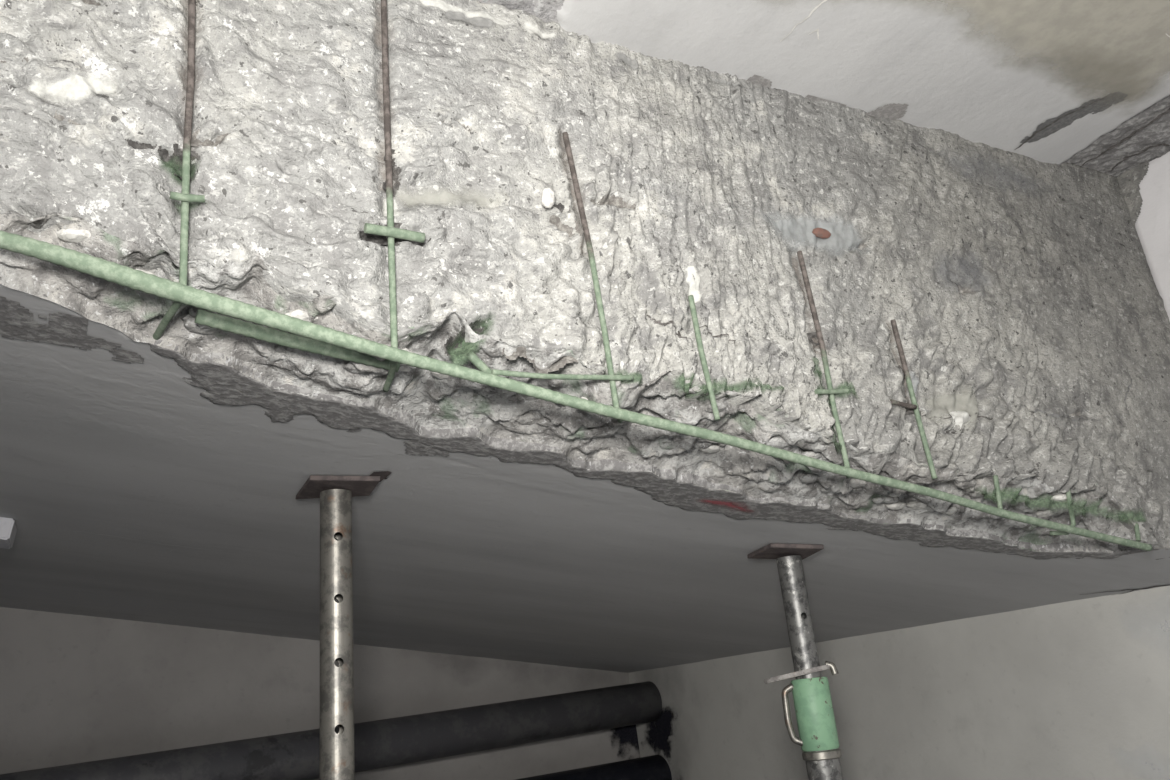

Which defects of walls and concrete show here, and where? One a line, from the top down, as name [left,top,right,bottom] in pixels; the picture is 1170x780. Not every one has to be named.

peeling [419,0,565,39]
peeling [28,73,117,125]
peeling [707,74,772,88]
peeling [867,103,908,120]
peeling [1015,91,1128,150]
spalling [123,129,230,181]
spalling [382,149,402,197]
spalling [549,203,584,237]
spalling [591,194,636,210]
flaking render [1117,160,1150,226]
spalling [0,211,1159,560]
leakage [611,708,674,758]